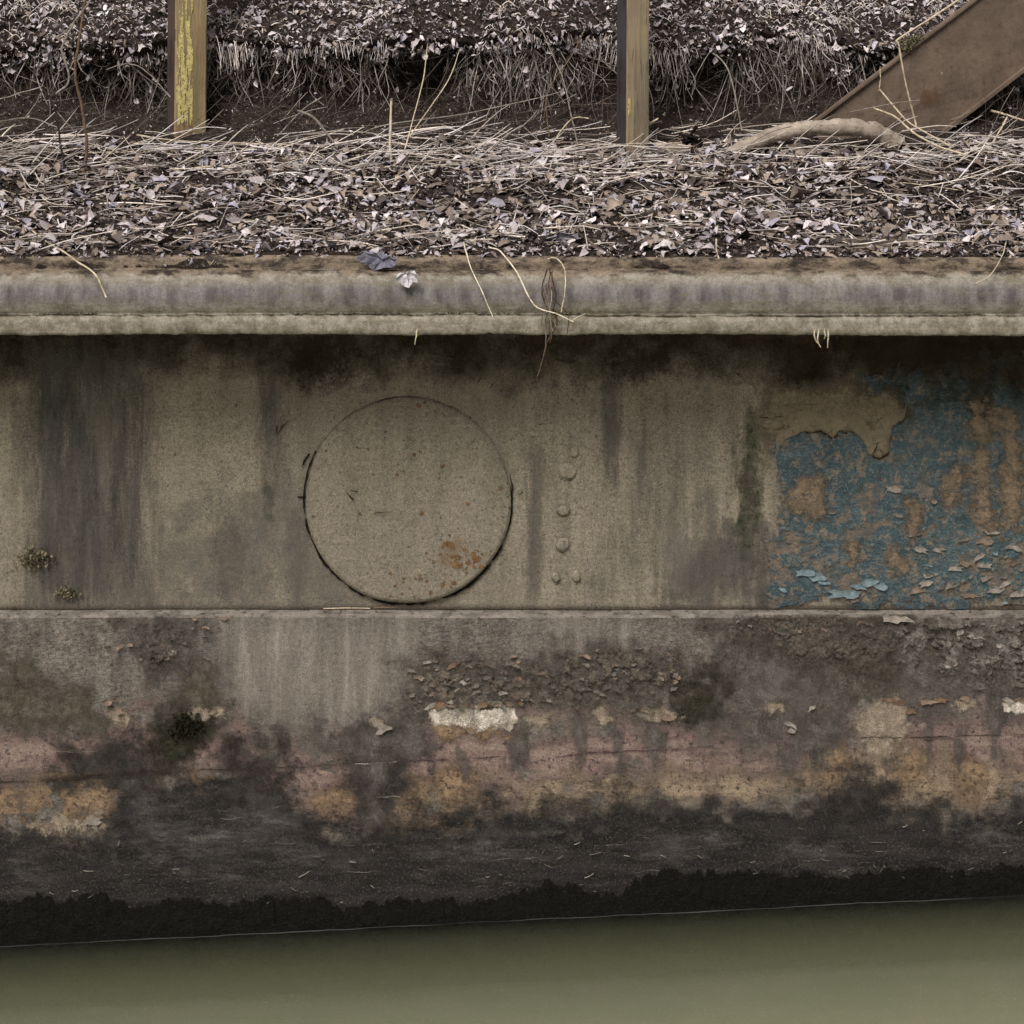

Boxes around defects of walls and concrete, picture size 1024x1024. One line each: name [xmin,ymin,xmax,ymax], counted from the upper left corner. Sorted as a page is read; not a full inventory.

water stain [926,335,1024,360]
corrosion [389,528,492,597]
water stain [0,333,910,627]
spalling [694,335,1024,773]
water stain [0,485,1024,912]
peeling [397,633,809,806]
water stain [0,956,1024,1024]